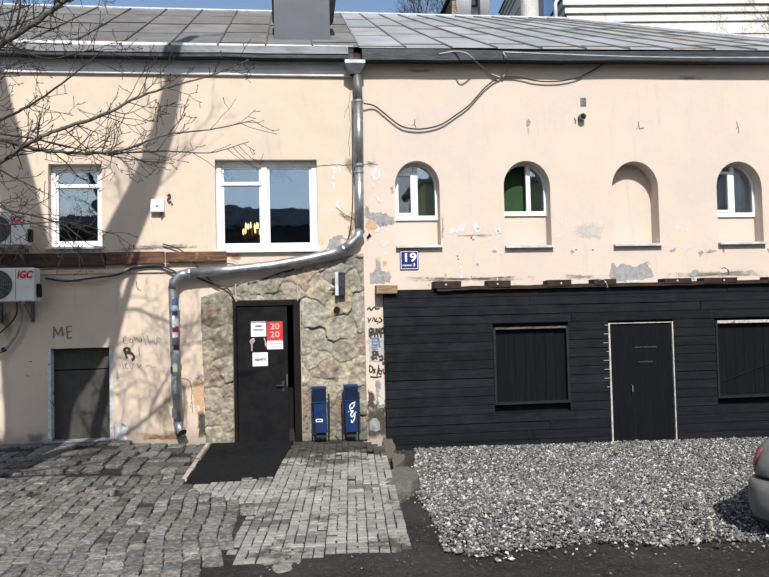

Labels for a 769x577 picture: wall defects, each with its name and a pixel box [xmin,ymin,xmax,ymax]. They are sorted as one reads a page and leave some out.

flaking render [364,205,395,241]
peeling [370,242,392,284]
peeling [609,261,653,283]
peeling [193,374,205,415]